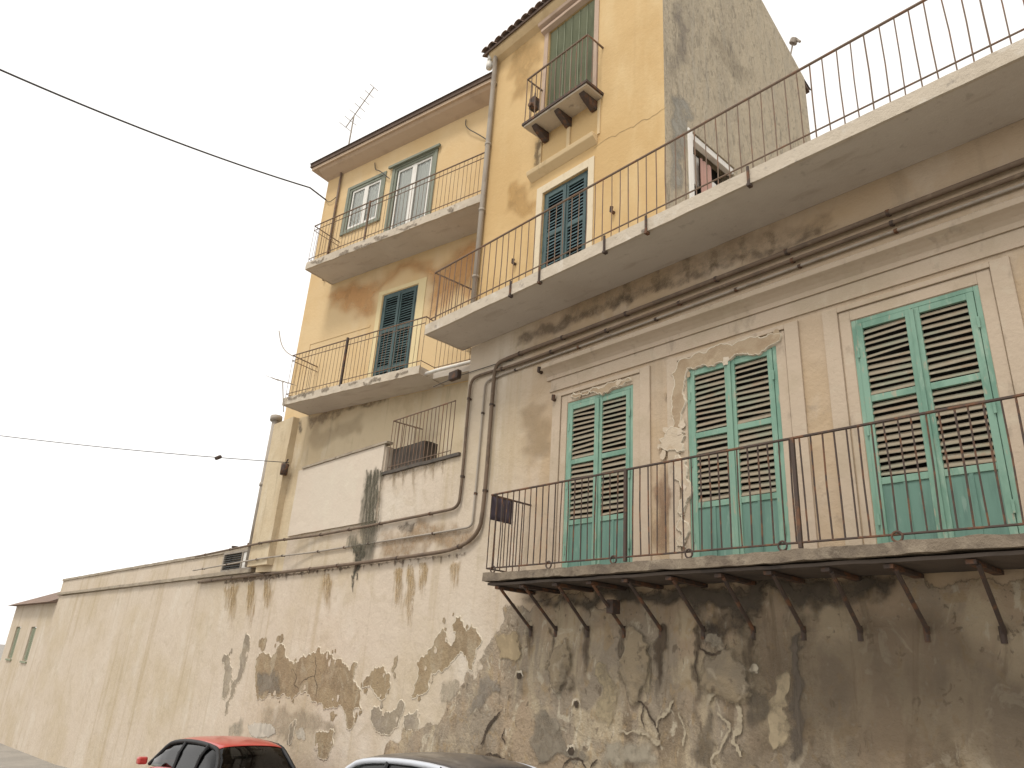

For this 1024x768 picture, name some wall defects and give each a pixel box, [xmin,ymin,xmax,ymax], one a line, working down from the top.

peeling [657,329,783,548]
flaking render [222,575,1024,768]
crack [636,700,660,740]
damp [537,576,1024,768]